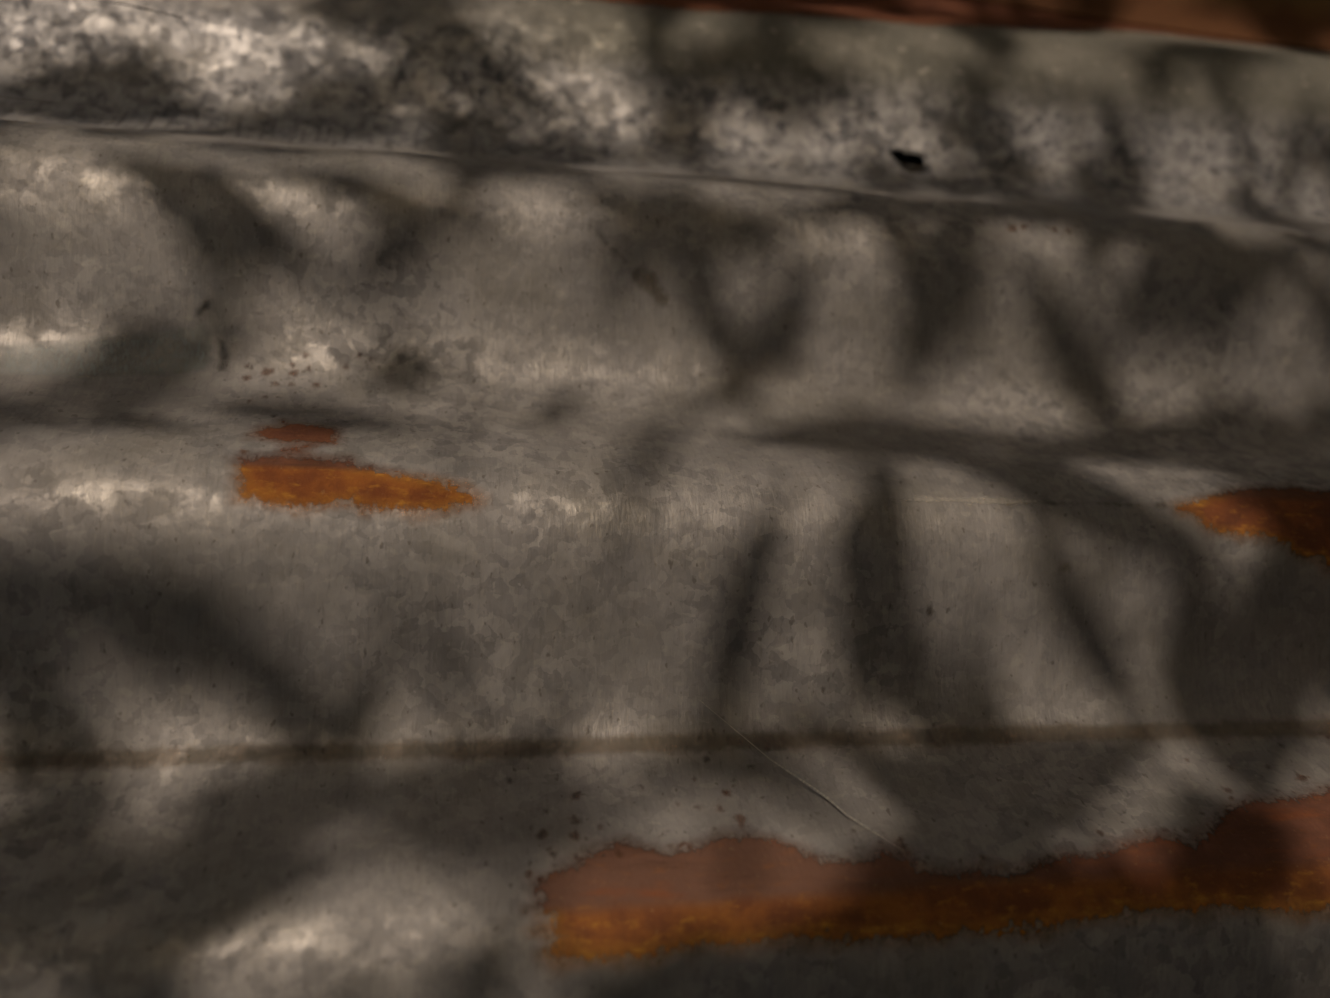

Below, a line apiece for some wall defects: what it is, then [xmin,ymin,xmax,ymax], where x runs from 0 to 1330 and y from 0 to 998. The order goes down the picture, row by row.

corrosion [236,421,476,513]
corrosion [1176,486,1330,567]
corrosion [525,787,1330,965]